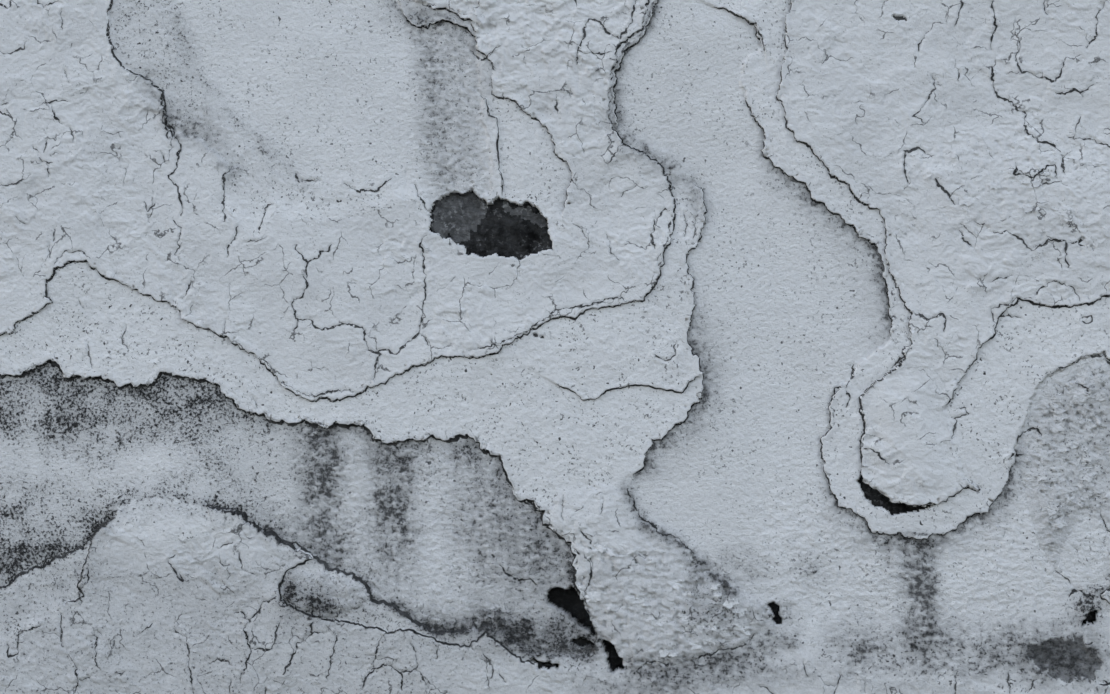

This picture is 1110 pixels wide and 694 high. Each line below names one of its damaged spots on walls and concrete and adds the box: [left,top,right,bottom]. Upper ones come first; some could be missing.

peeling [102,0,578,260]
crack [903,73,960,204]
crack [990,1,1110,186]
crack [264,240,428,397]
crack [959,223,1093,326]
crack [141,596,337,694]
peeling [0,354,597,659]
leakage [259,421,427,601]
leakage [394,441,604,663]
spalling [602,640,624,671]
spalling [858,476,931,515]
leakage [830,443,1104,684]